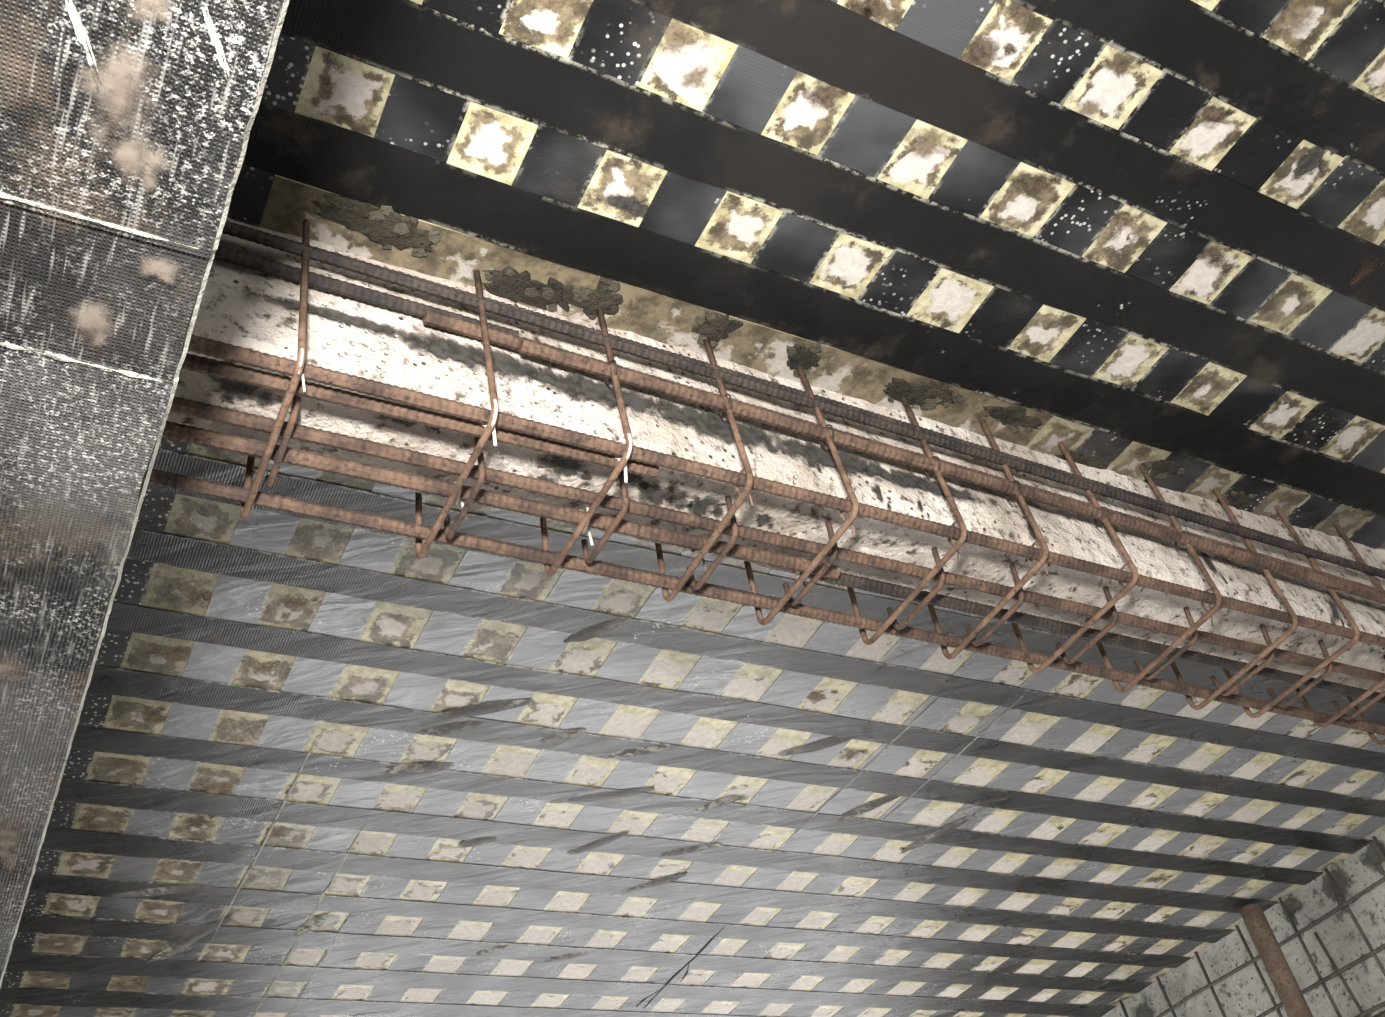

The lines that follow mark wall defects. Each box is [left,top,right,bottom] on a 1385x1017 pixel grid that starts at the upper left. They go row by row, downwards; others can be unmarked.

spalling [311,193,440,257]
spalling [482,266,624,320]
spalling [691,309,743,347]
spalling [786,343,822,377]
water stain [247,291,997,517]
spalling [883,377,965,410]
spalling [982,406,1042,433]
spalling [1055,449,1109,469]
spalling [1141,459,1185,479]
spalling [1220,491,1254,510]